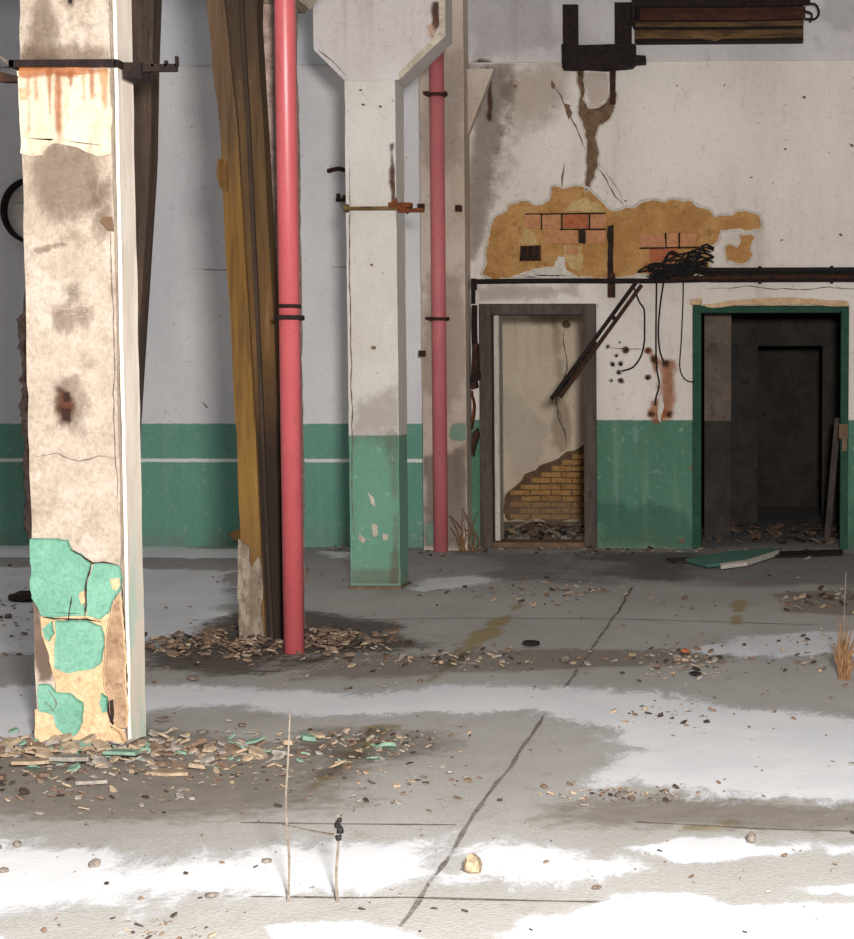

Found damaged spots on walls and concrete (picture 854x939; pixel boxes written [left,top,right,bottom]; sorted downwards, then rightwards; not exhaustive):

corrosion [19,67,106,131]
peeling [17,69,113,157]
peeling [480,71,764,279]
corrosion [56,388,74,421]
corrosion [645,348,674,422]
flaking render [504,442,584,522]
peeling [30,538,129,746]